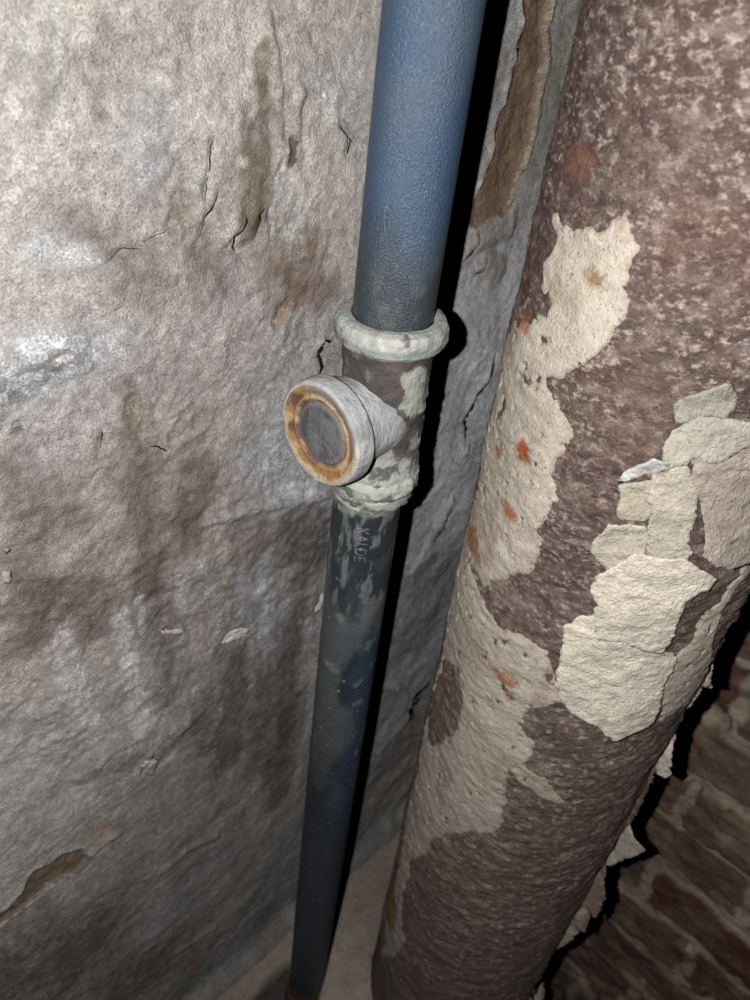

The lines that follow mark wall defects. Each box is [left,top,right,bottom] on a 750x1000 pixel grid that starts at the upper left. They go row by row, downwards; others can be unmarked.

water stain [241,36,275,241]
water stain [308,42,368,163]
flaking render [470,0,550,228]
crack [198,140,218,238]
crack [226,208,265,251]
crack [317,339,333,374]
rust [517,440,529,463]
rust [501,498,516,521]
peeling [554,382,750,742]
rust [491,666,518,700]
flaking render [0,849,90,924]
peeling [556,732,677,950]